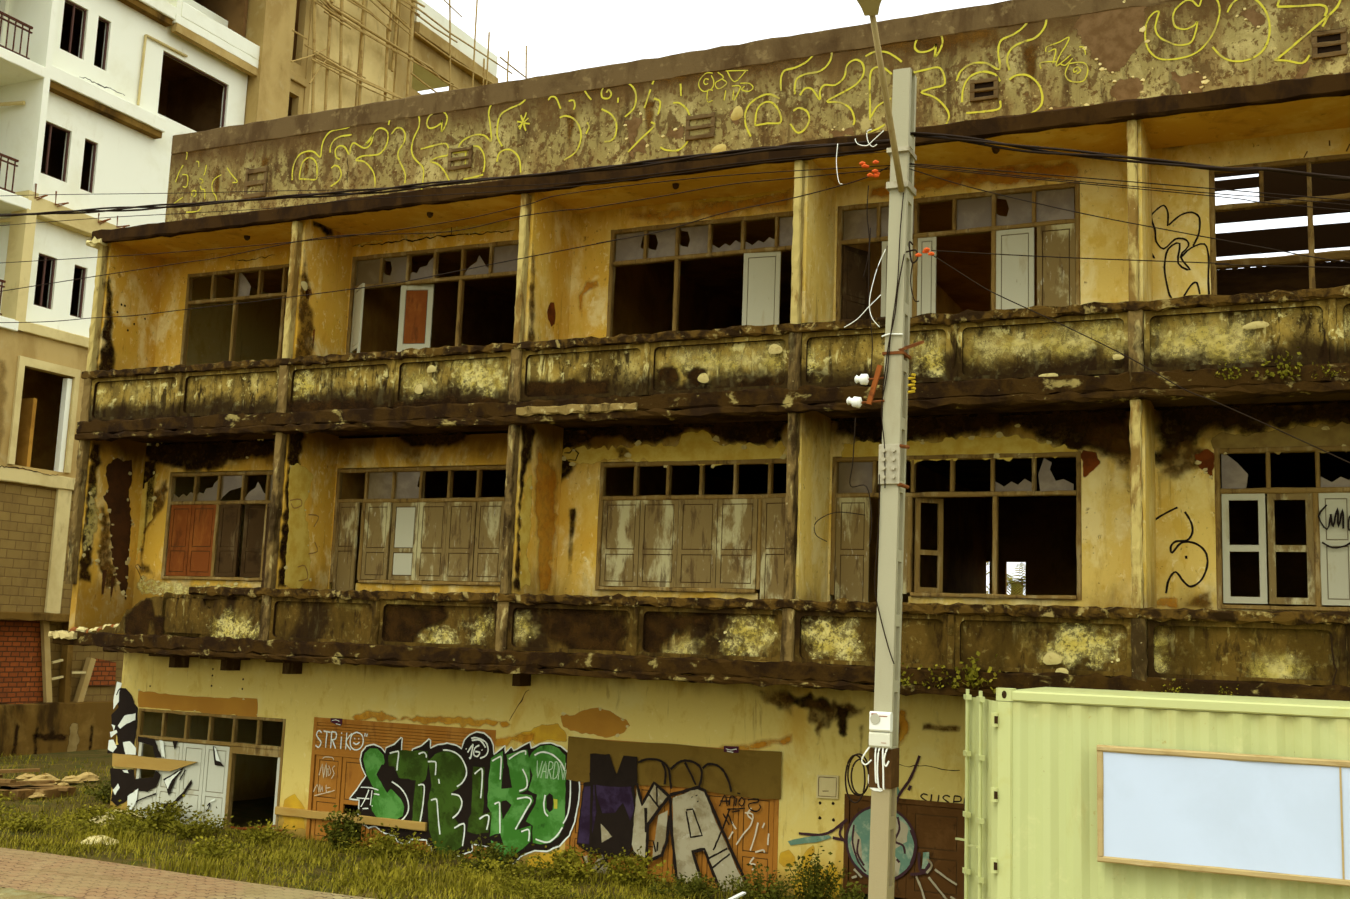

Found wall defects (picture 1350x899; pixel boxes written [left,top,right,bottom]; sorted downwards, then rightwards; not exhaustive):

flaking render [1235,7,1266,28]
flaking render [1073,0,1150,101]
flaking render [1171,71,1209,94]
flaking render [623,112,685,159]
water stain [97,277,115,371]
water stain [657,350,783,393]
flaking render [82,457,238,600]
water stain [213,611,259,639]
water stain [384,604,493,648]
water stain [802,619,861,661]
water stain [1040,623,1120,667]
water stain [760,691,862,736]